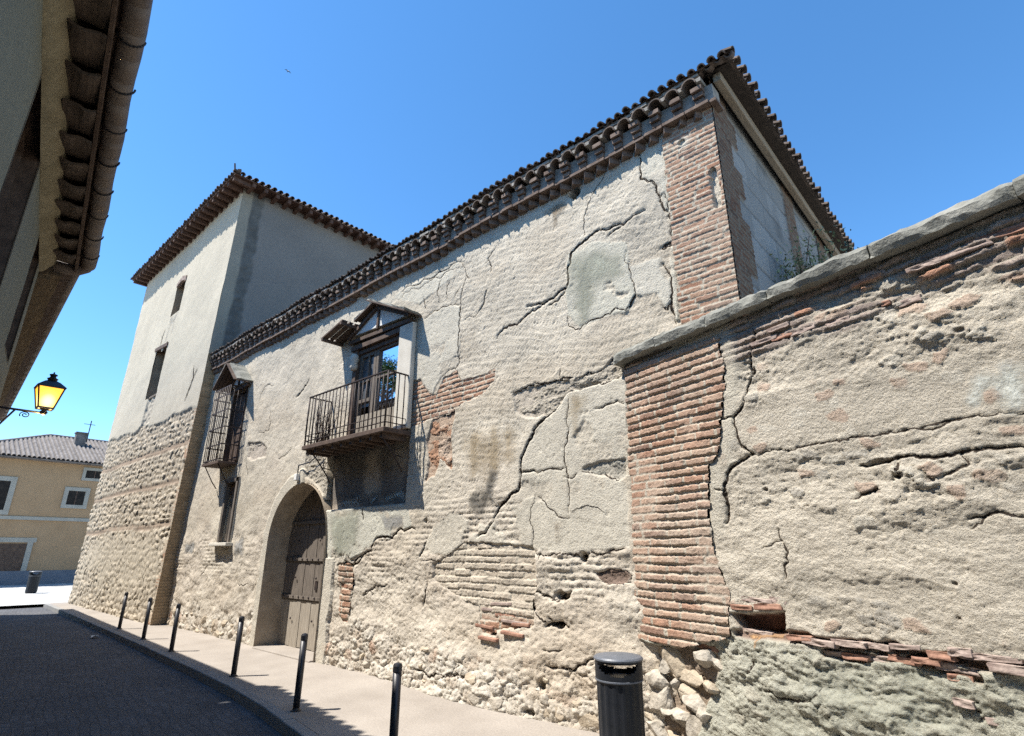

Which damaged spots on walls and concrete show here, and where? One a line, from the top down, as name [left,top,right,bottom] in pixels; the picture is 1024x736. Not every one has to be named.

crack [498,154,676,335]
flaking render [905,222,1024,274]
crack [402,249,495,377]
flaking render [333,563,393,681]
flaking render [411,369,495,481]
crack [338,359,624,603]
flaking render [434,543,537,642]
spalling [597,569,632,585]
crack [764,530,789,579]
crack [715,331,1023,523]
flaking render [729,628,1024,683]
crack [971,510,1021,529]